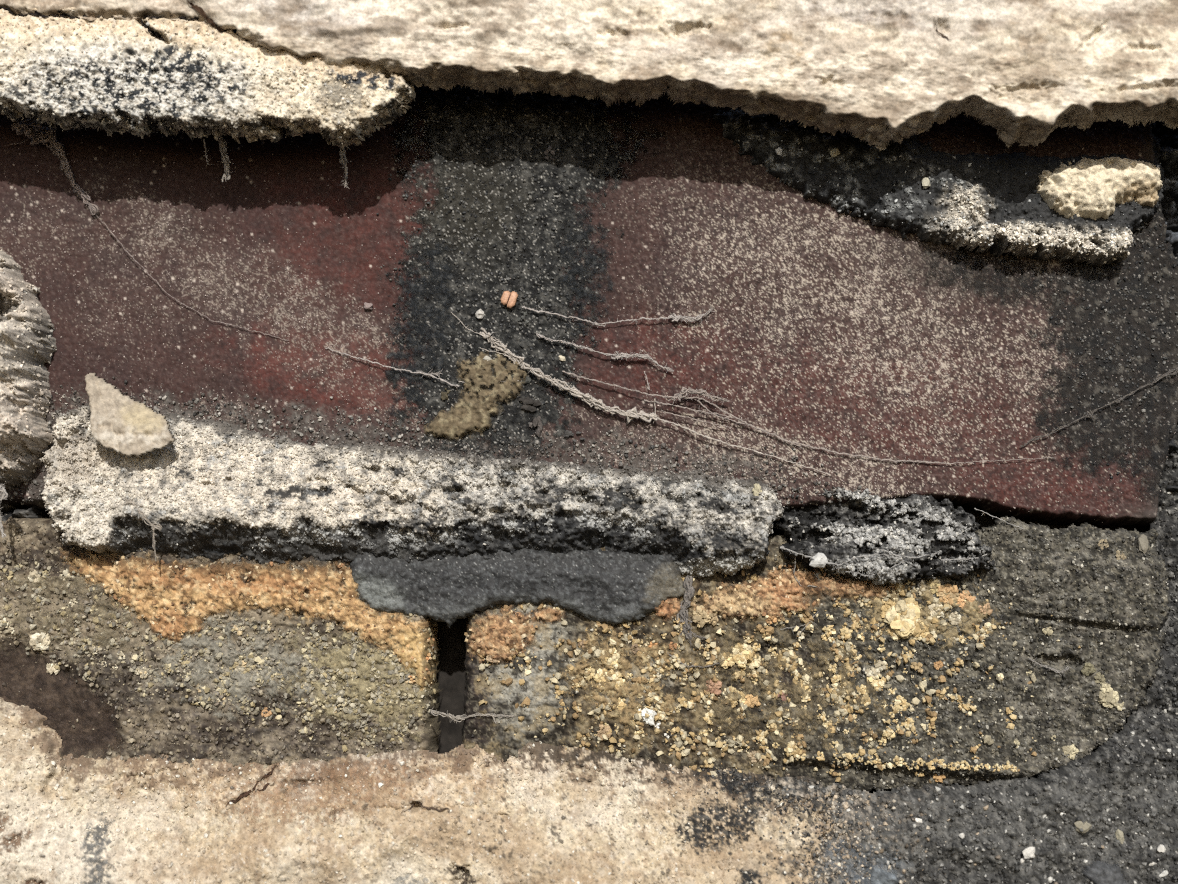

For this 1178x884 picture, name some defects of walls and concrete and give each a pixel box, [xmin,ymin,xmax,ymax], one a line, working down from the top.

peeling [85,373,176,457]
efflorescence [1098,539,1127,560]
spalling [1138,534,1149,554]
spalling [0,639,124,761]
damp [0,553,437,757]
efflorescence [470,574,1037,783]
efflorescence [1081,662,1126,711]
efflorescence [1051,735,1079,760]
damp [821,838,892,884]